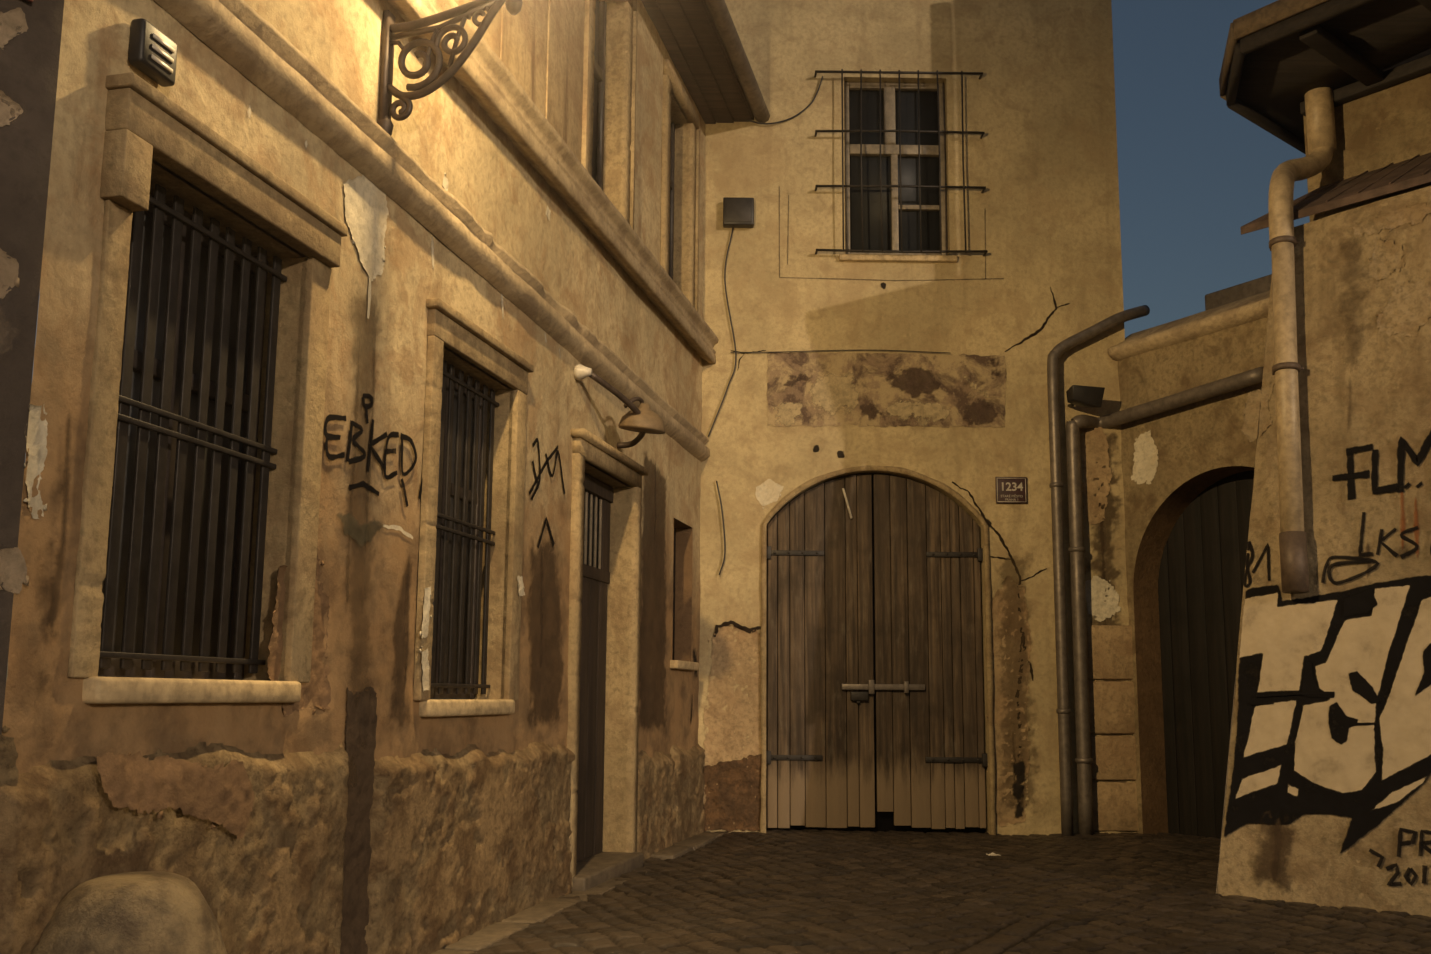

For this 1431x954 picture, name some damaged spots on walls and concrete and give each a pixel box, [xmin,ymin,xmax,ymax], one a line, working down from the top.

spalling [0,7,28,50]
spalling [0,90,23,127]
spalling [344,175,389,319]
crack [1005,287,1070,352]
spalling [0,547,29,594]
spalling [267,565,288,681]
crack [714,620,761,637]
crack [952,481,1047,761]
spalling [0,725,19,786]
spalling [278,555,377,954]
spalling [95,751,255,839]